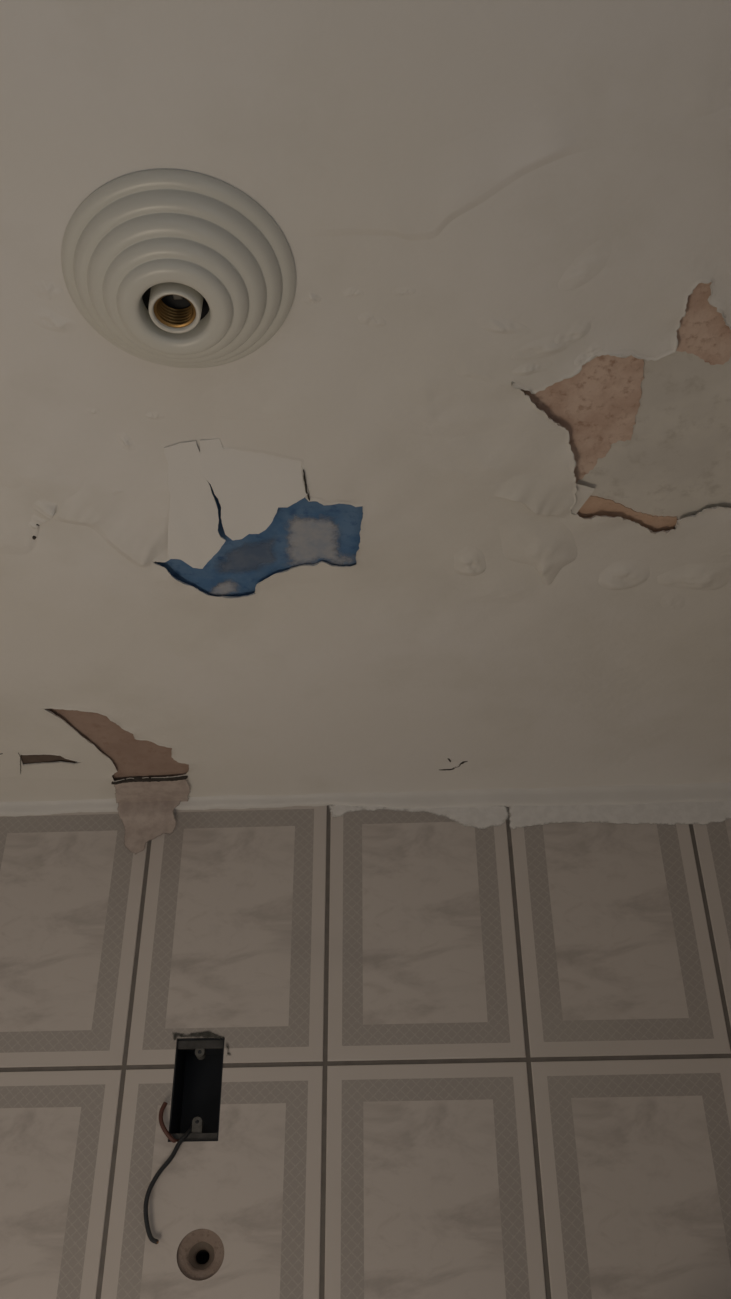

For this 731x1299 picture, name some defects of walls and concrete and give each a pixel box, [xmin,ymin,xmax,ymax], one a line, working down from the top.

peeling [509,277,731,535]
peeling [152,438,367,599]
peeling [21,755,77,764]
peeling [40,706,192,854]